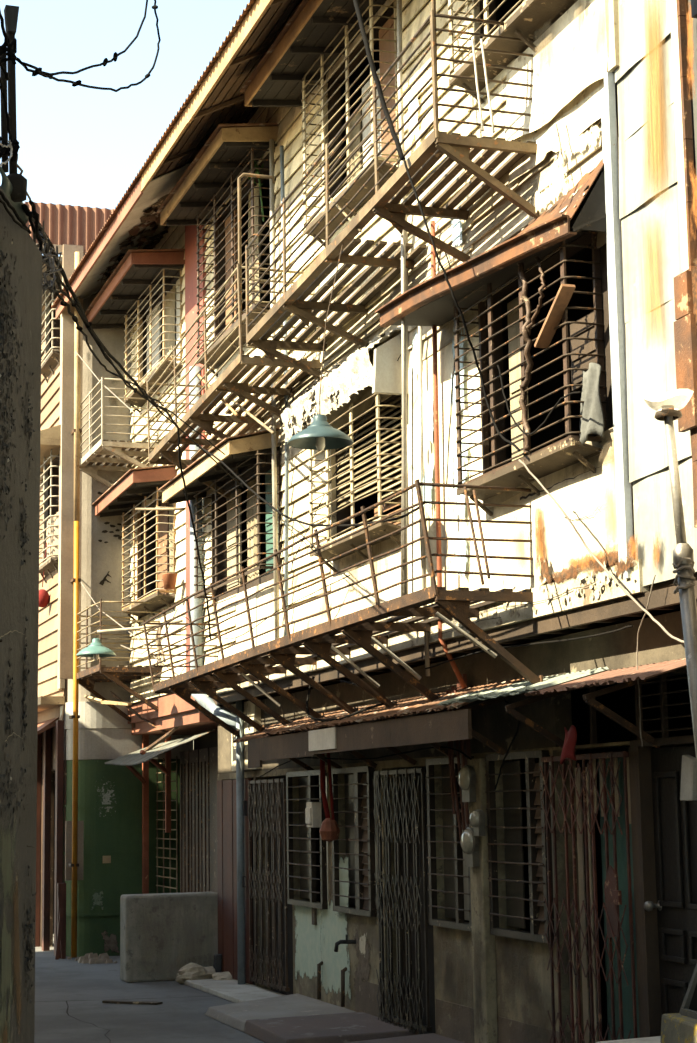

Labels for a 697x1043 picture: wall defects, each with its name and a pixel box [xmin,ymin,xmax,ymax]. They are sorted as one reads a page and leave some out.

rust [645,17,665,177]
rust [643,231,661,326]
spalling [285,363,340,435]
rust [535,507,551,588]
rust [615,537,638,576]
peeling [96,779,116,817]
leakage [0,822,21,1043]